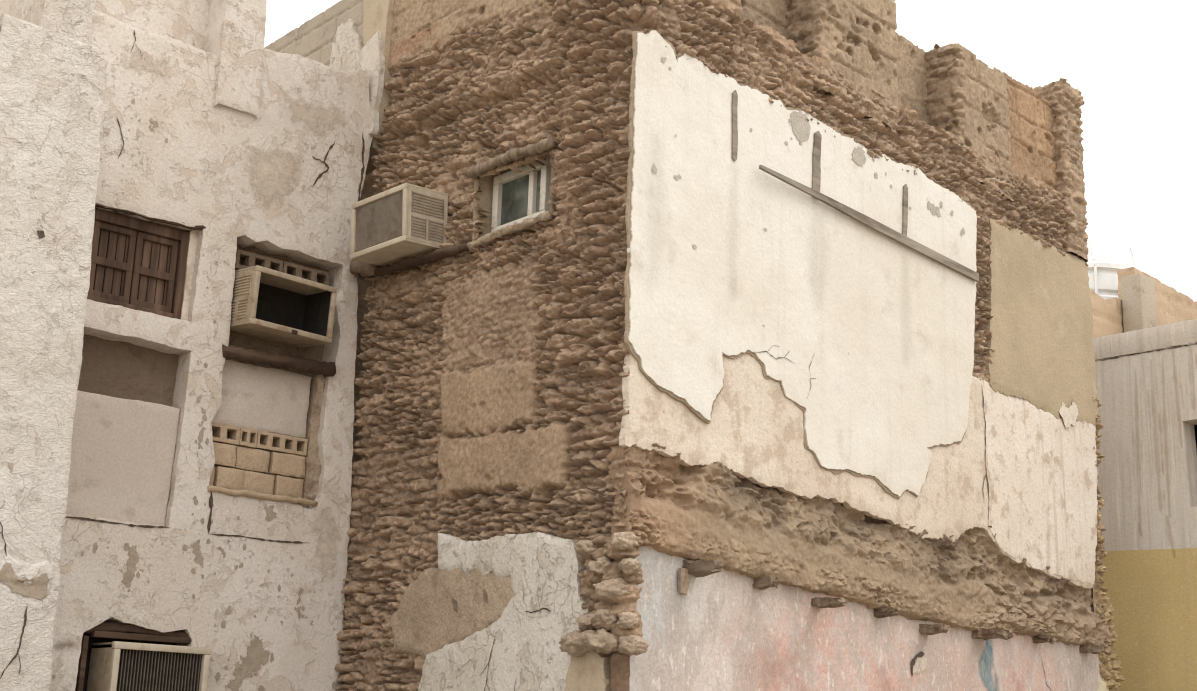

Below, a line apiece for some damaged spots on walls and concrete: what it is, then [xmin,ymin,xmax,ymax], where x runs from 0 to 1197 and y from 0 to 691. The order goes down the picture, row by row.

crack [312,135,365,201]
flaking render [619,30,1098,589]
crack [981,391,989,520]
crack [0,608,27,679]
flaking render [418,532,590,691]
peeling [678,568,690,595]